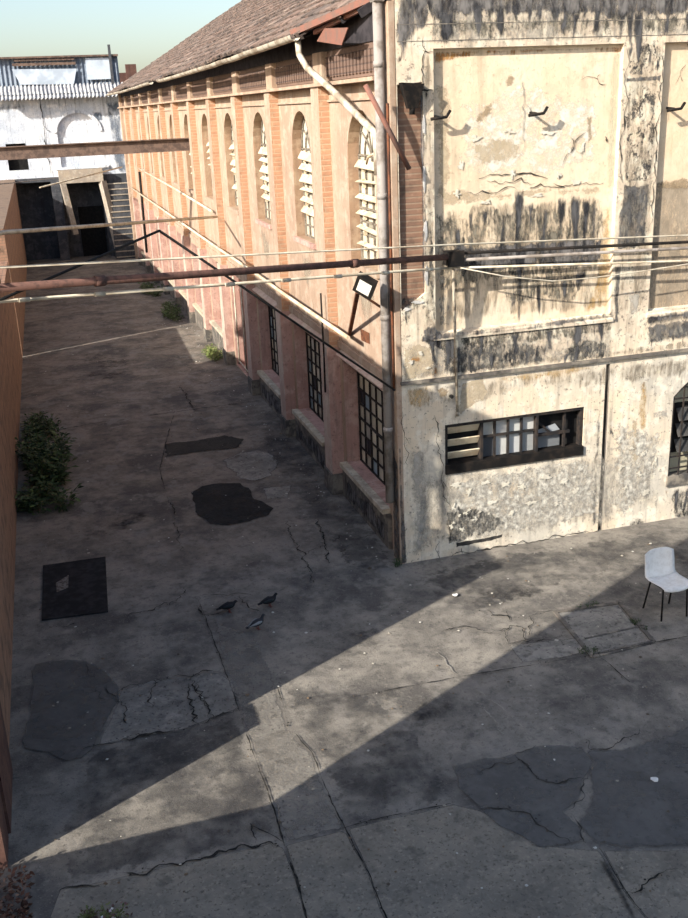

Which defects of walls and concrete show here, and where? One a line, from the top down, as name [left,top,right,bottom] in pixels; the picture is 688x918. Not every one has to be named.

peeling [457,85,596,185]
leakage [397,0,688,383]
crack [472,50,629,195]
crack [648,49,685,231]